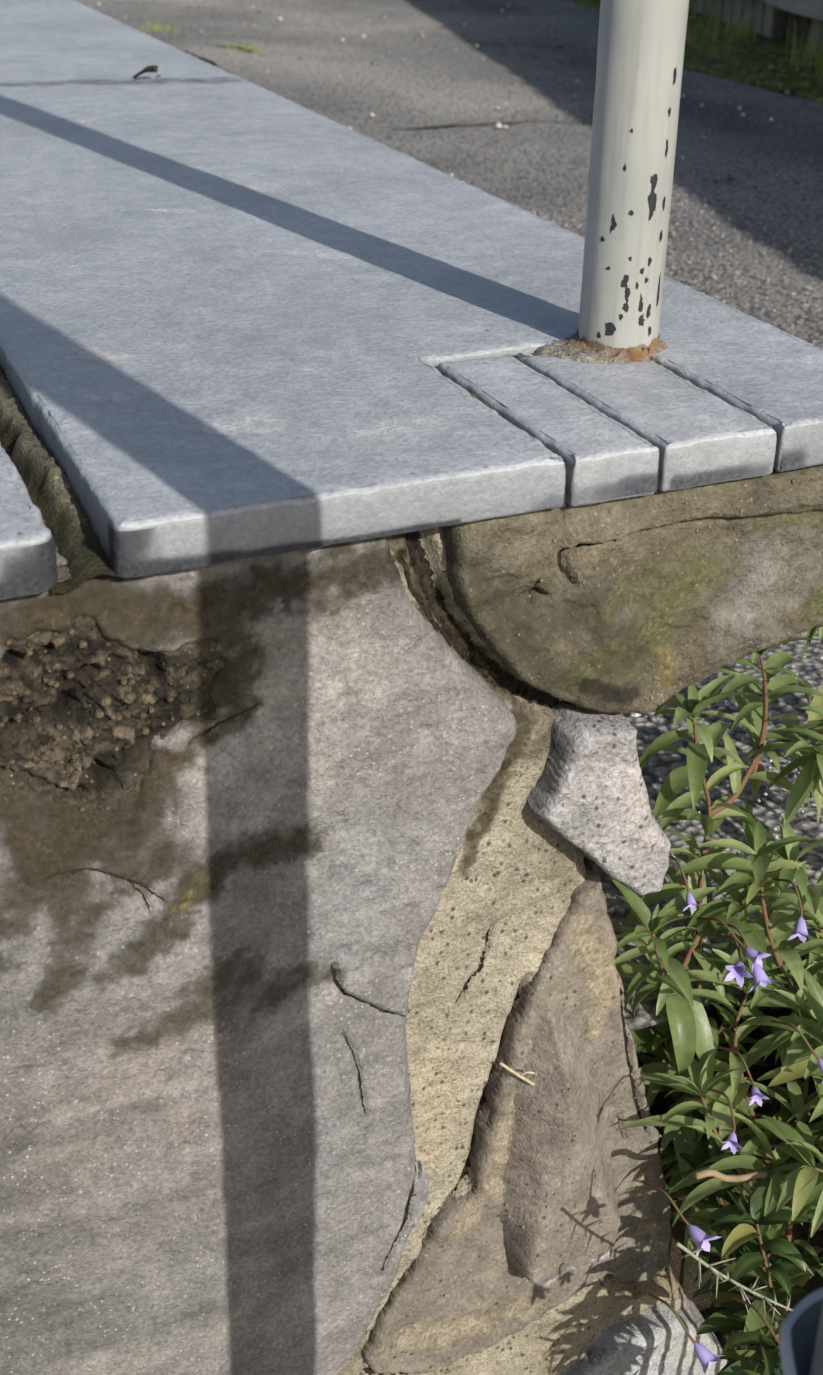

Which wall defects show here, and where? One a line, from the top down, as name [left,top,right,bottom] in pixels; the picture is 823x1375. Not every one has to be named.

peeling [601,174,666,242]
peeling [597,257,661,338]
rust [576,329,660,361]
crack [523,539,617,596]
spalling [0,616,239,812]
leakage [0,520,537,1012]
crack [45,868,166,912]
leakage [116,953,343,1050]
crack [331,966,406,1017]
crack [454,930,489,1004]
crack [342,1032,366,1113]